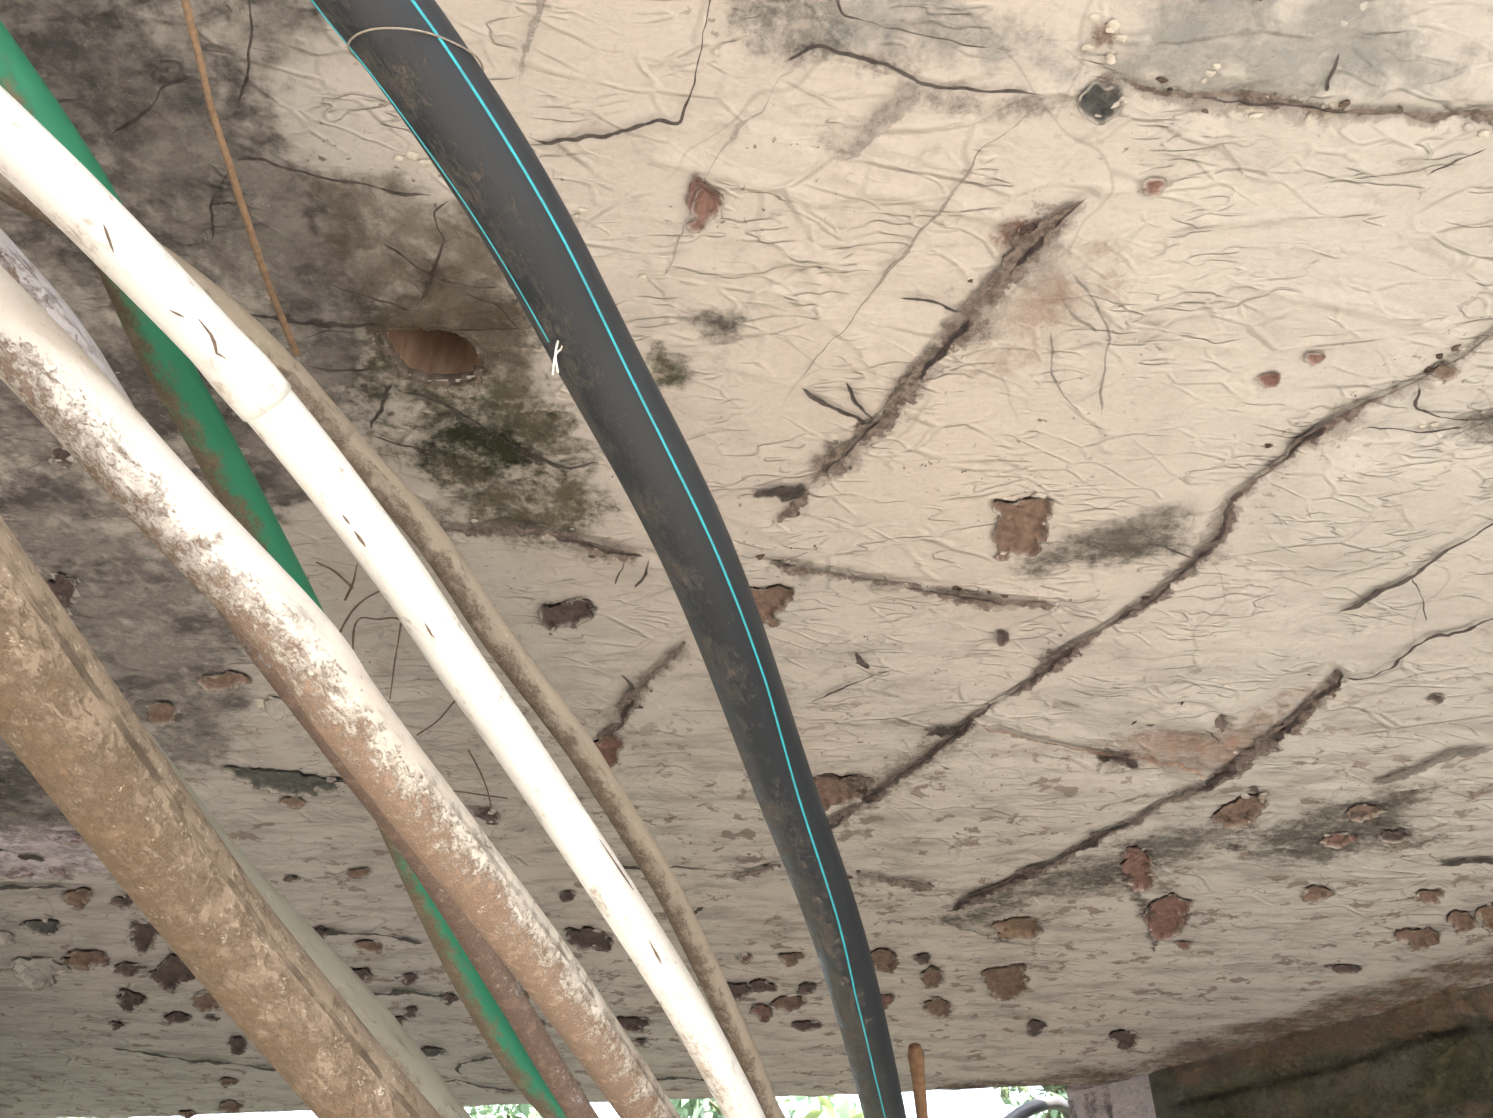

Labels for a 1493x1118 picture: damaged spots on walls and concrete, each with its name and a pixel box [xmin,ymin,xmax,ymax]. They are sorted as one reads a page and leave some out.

spalling [686,176,724,235]
crack [664,0,1493,947]
leakage [0,379,250,769]
spalling [992,492,1054,561]
leakage [0,735,108,880]
spalling [0,894,222,1030]
spalling [727,952,822,1032]
spalling [871,948,952,1018]
spalling [981,963,1030,1002]
spalling [1120,845,1193,950]
spalling [1395,888,1493,952]
leakage [1159,987,1493,1118]